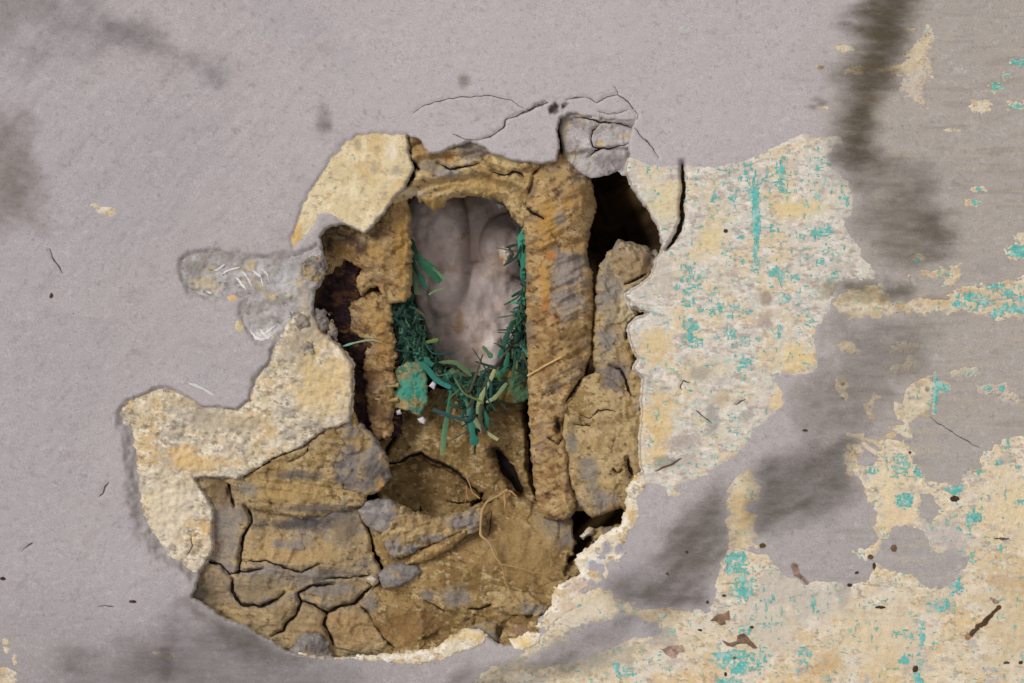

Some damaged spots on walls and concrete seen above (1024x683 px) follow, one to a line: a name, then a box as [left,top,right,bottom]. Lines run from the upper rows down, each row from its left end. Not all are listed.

damp [843,0,908,163]
peeling [880,24,935,110]
crack [407,87,657,186]
crack [667,165,686,249]
peeling [119,133,415,573]
spalling [420,321,450,392]
peeling [474,108,1024,683]
crack [385,437,492,536]
crack [189,438,393,647]
spalling [298,628,488,665]